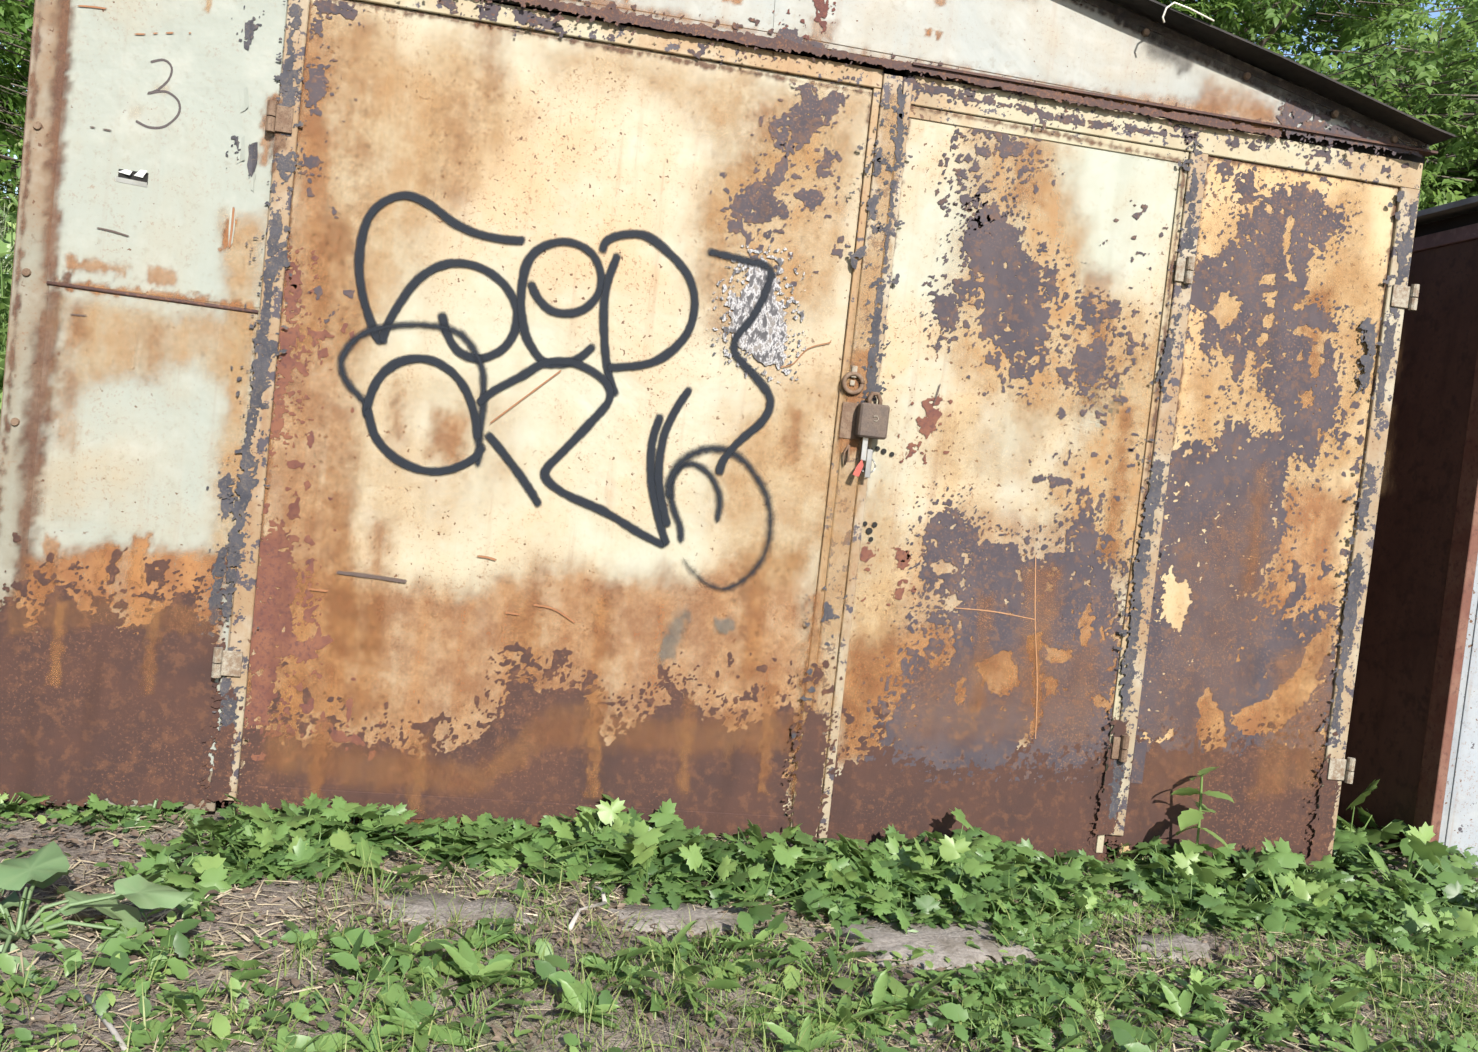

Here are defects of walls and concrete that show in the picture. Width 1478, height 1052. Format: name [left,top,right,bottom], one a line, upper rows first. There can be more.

spalling [438,0,573,40]
rust [0,0,1397,870]
spalling [685,33,740,65]
peeling [710,0,1428,824]